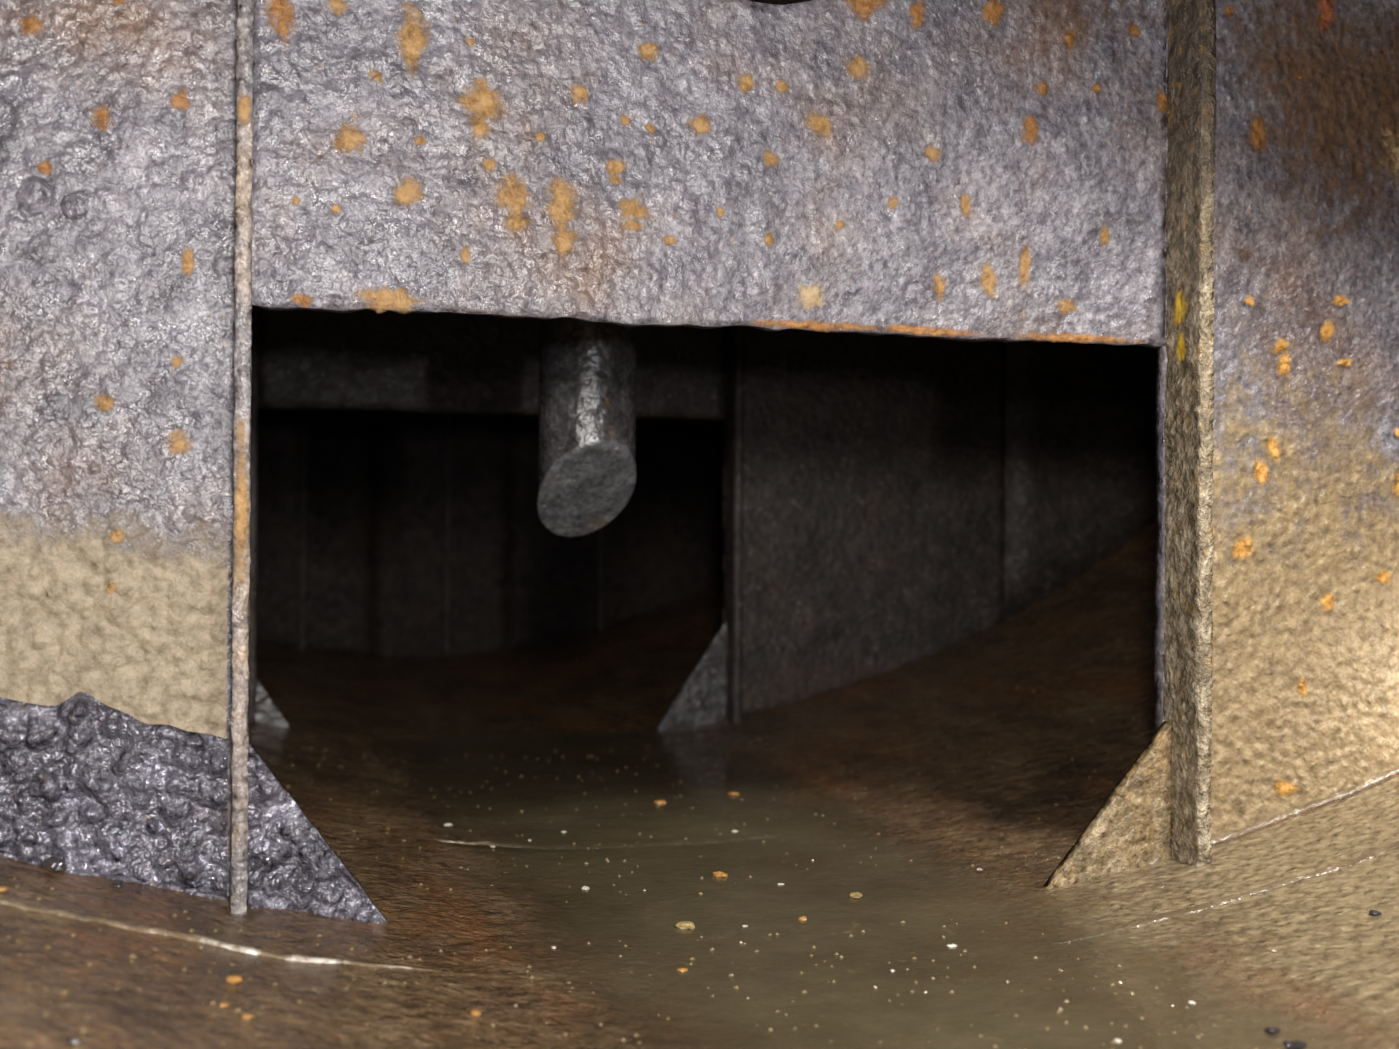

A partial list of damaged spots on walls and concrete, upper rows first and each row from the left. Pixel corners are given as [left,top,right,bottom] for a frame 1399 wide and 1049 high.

corrosion [398,5,427,65]
corrosion [460,79,502,136]
corrosion [394,179,423,204]
corrosion [484,159,530,231]
corrosion [548,180,577,253]
corrosion [607,160,648,231]
corrosion [358,288,417,310]
corrosion [757,286,868,330]
corrosion [887,324,970,336]
corrosion [1275,339,1290,374]
corrosion [1321,322,1333,339]
corrosion [1210,388,1399,838]